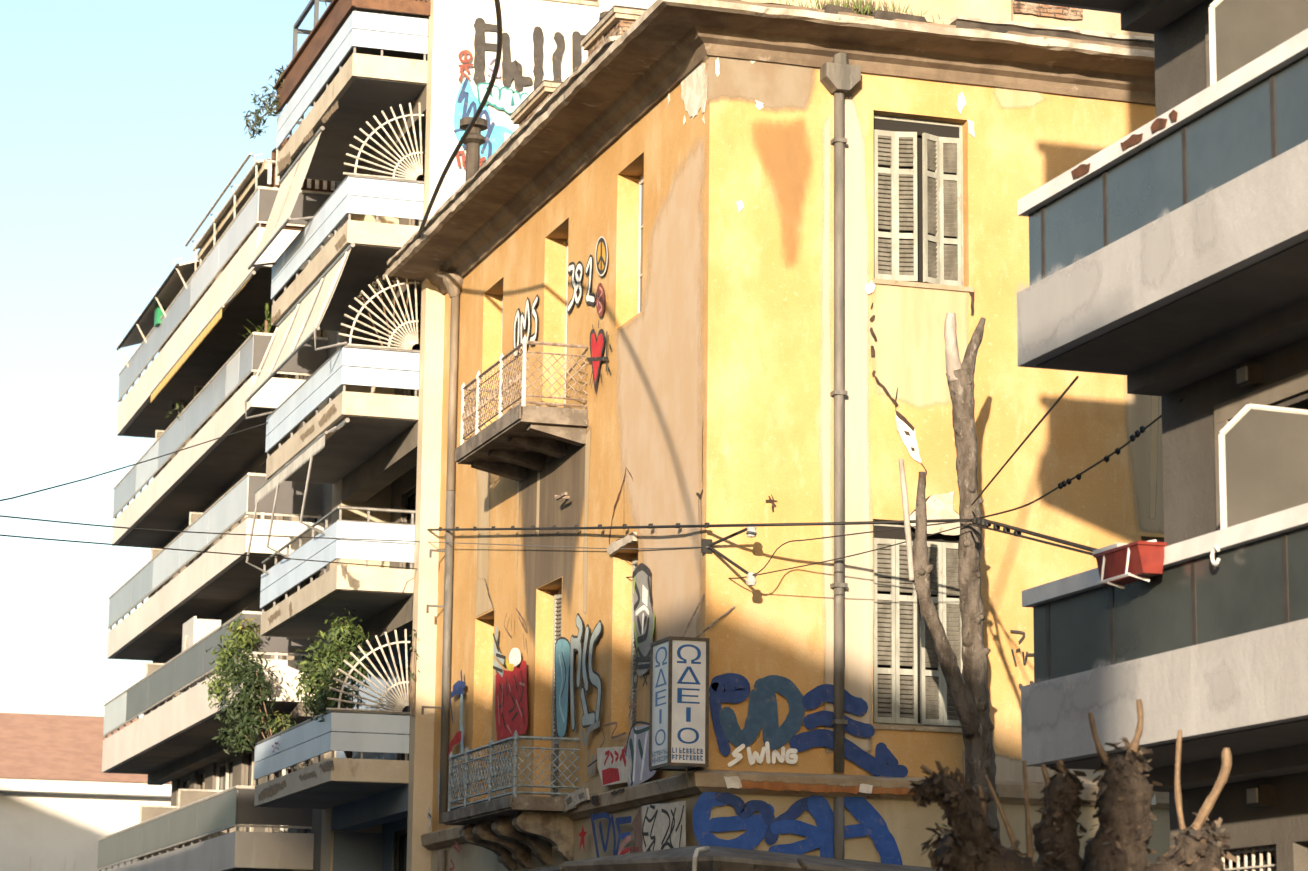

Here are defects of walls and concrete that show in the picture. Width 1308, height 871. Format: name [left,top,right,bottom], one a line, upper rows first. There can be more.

flaking render [1013,0,1083,19]
flaking render [668,56,815,125]
peeling [957,92,975,137]
leakage [756,96,874,752]